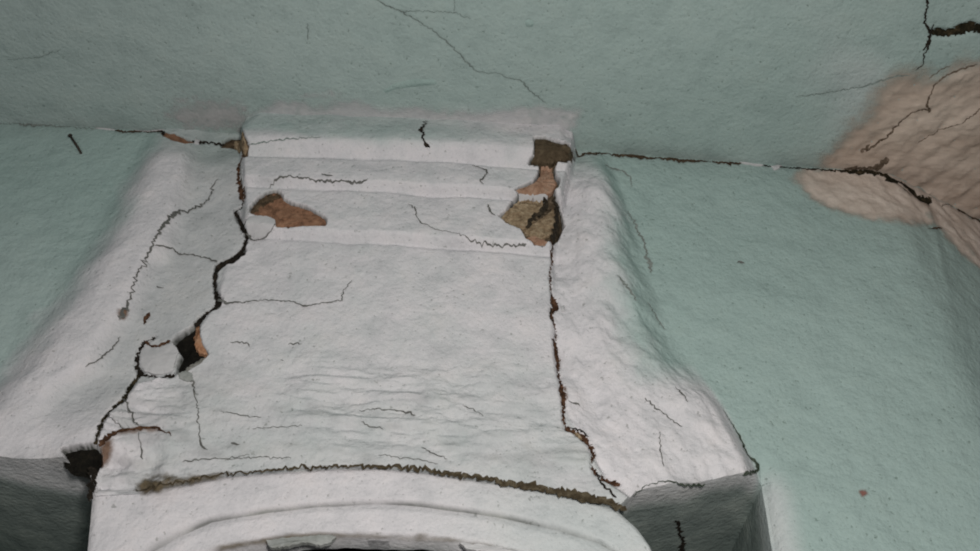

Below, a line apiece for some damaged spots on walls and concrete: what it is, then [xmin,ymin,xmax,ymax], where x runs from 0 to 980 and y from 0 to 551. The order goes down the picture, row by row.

crack [0,123,160,133]
crack [575,0,980,229]
spalling [250,193,326,228]
spalling [501,139,573,246]
spalling [175,326,208,382]
crack [85,137,706,511]
spalling [63,449,103,479]
crack [724,411,760,475]